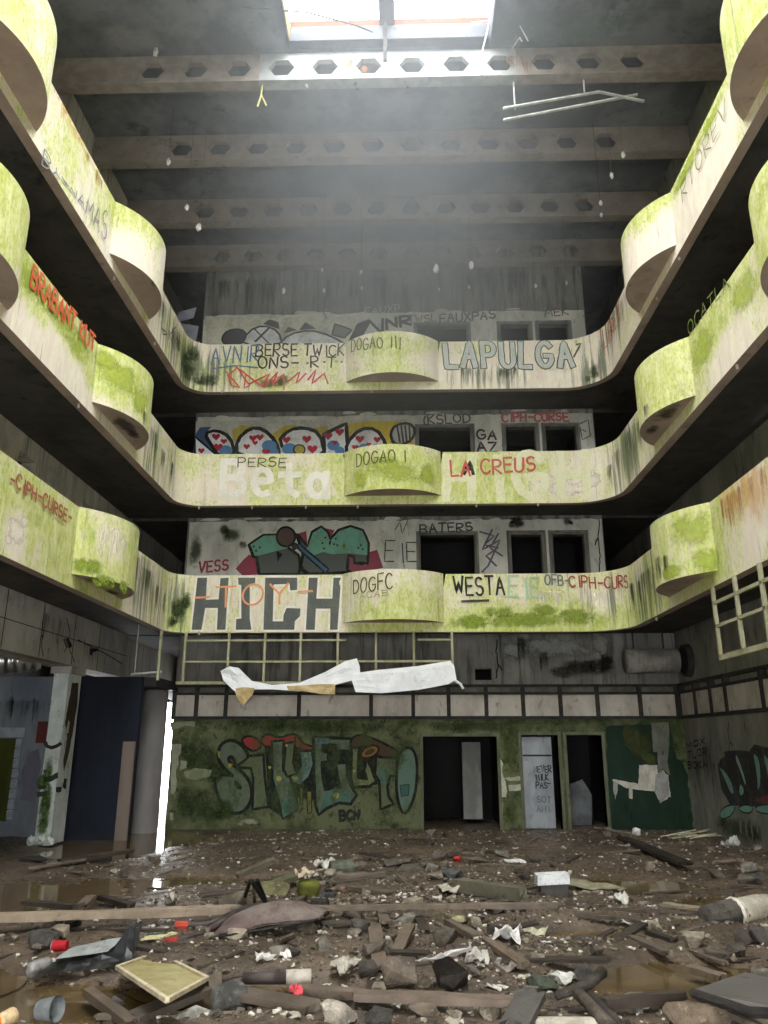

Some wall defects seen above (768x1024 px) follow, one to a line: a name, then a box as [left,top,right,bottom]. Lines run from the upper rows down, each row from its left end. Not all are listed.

damp [518,638,613,677]
peeling [613,722,671,803]